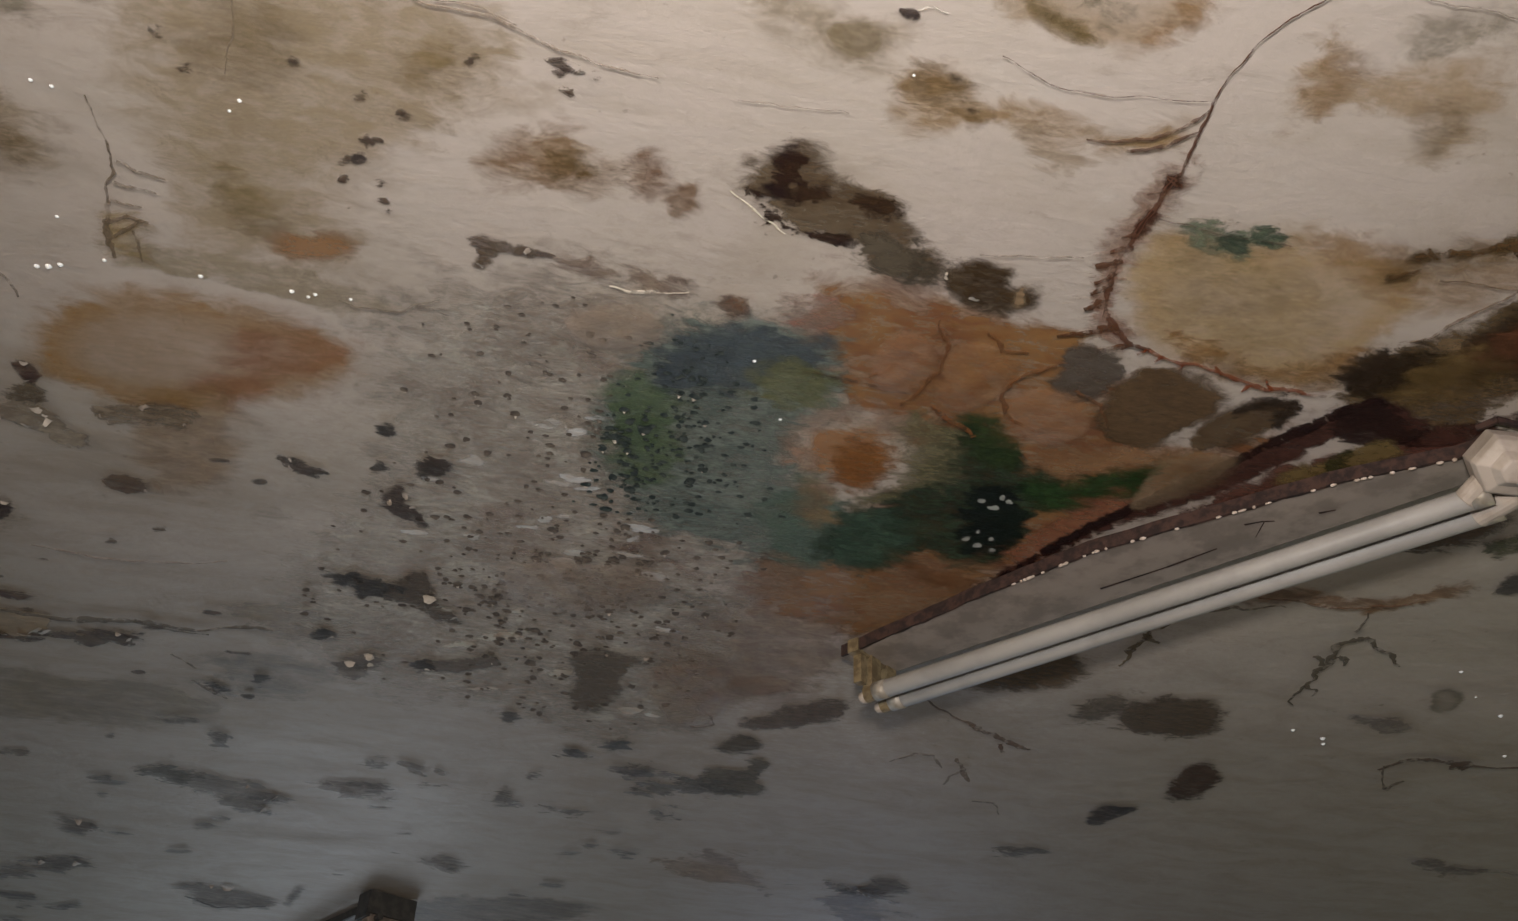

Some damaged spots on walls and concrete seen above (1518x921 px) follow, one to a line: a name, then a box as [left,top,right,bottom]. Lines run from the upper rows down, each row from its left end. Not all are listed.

water stain [902,75,1017,123]
crack [803,0,1327,438]
water stain [277,234,352,259]
water stain [570,140,1518,635]
water stain [972,656,1087,692]
crack [1118,624,1171,666]
crack [1211,598,1426,706]
water stain [1070,694,1227,739]
crack [1377,758,1518,791]